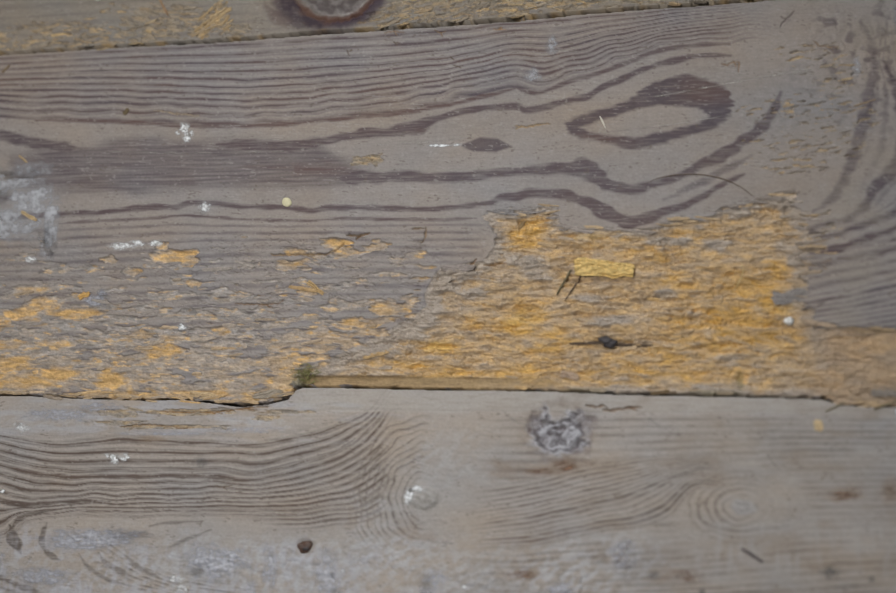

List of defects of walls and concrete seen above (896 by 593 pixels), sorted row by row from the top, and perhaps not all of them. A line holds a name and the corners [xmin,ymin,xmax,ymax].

peeling [0,0,252,51]
peeling [352,0,714,30]
peeling [771,288,824,310]